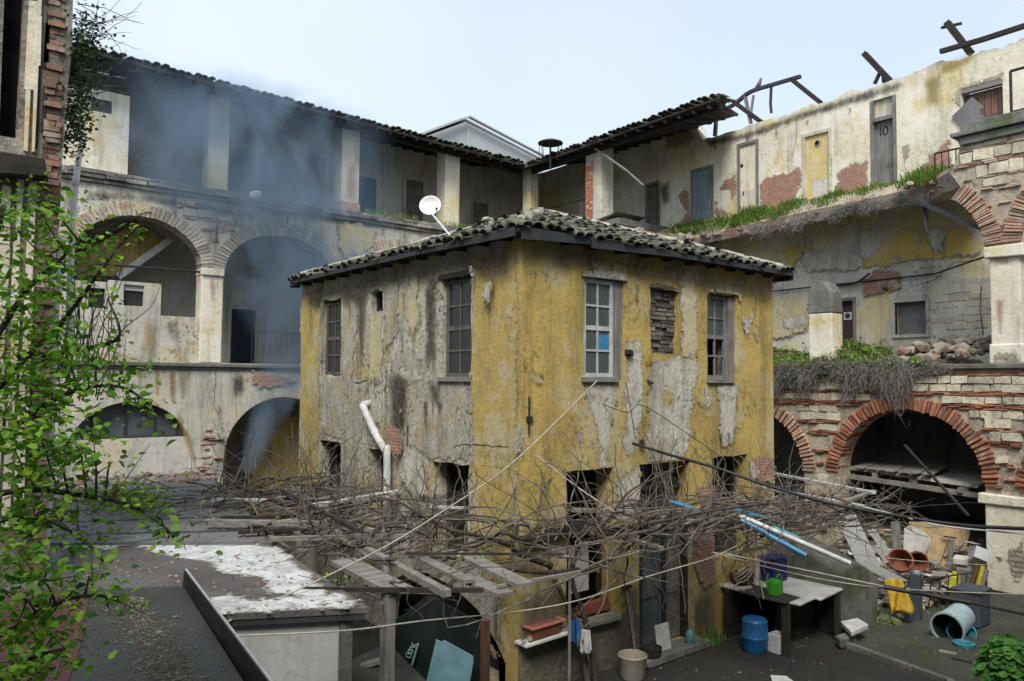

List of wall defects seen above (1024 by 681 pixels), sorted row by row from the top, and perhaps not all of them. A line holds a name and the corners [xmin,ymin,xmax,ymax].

flaking render [713,172,736,216]
flaking render [760,166,802,207]
flaking render [836,160,868,191]
flaking render [250,370,297,389]
damp [392,375,408,439]
peeling [383,271,473,499]
peeling [574,265,742,509]